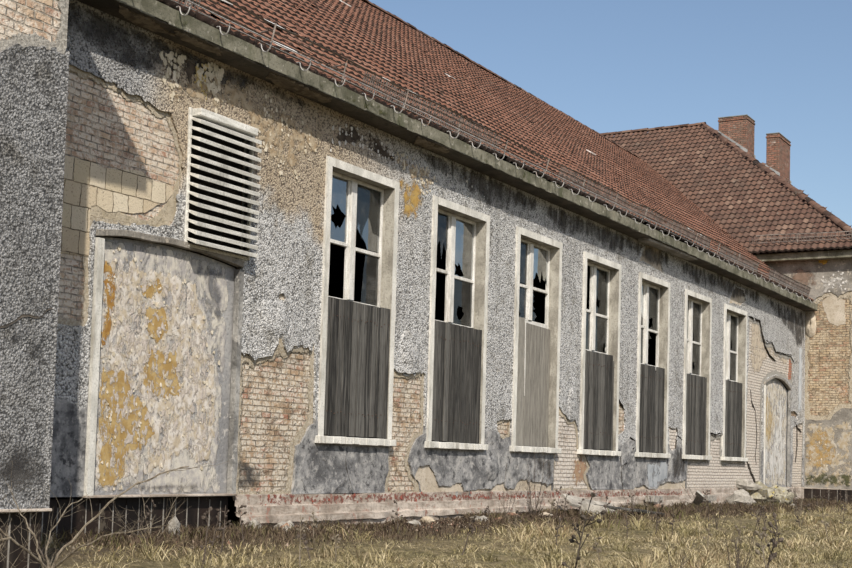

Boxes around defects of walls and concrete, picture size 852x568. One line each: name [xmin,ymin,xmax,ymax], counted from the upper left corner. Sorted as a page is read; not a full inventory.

flaking render [0,0,69,56]
peeling [159,30,321,179]
spalling [266,72,332,103]
flaking render [58,65,187,326]
peeling [95,241,228,493]
flaking render [232,270,852,506]
crack [748,316,791,361]